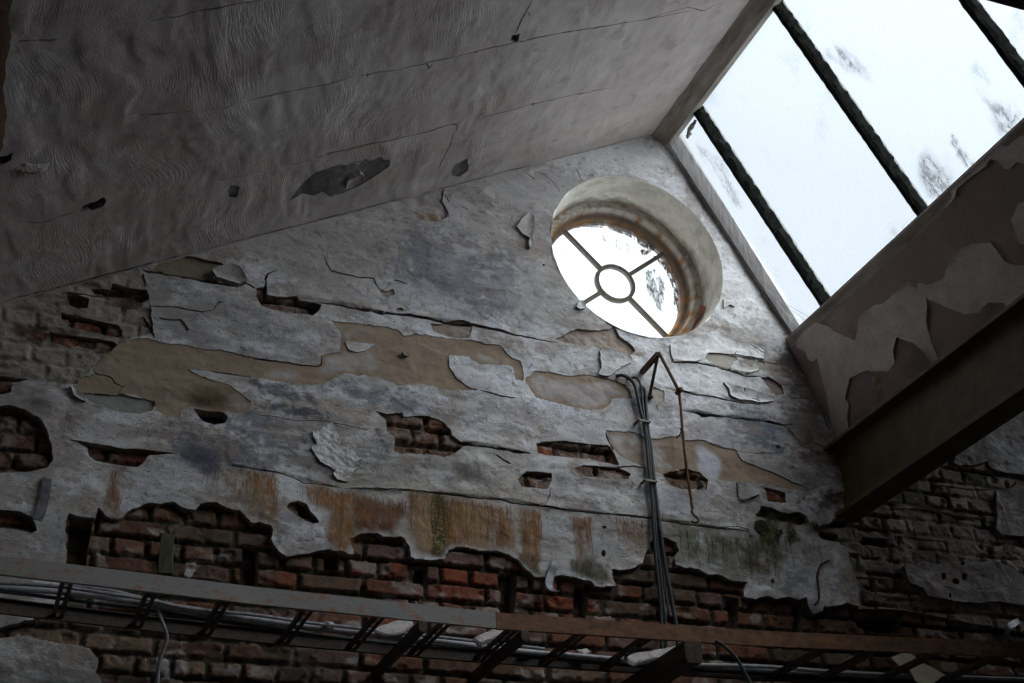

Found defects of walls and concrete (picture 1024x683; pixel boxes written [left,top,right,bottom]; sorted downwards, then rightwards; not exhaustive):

crack [126,0,716,118]
crack [3,88,647,343]
peeling [291,157,390,200]
peeling [942,135,1024,209]
peeling [0,256,635,473]
peeling [670,305,784,403]
peeling [796,242,1024,436]
corrosion [307,486,542,568]
spalling [60,421,1024,643]
spalling [0,619,633,683]
spalling [406,621,682,656]
spalling [701,643,1024,676]